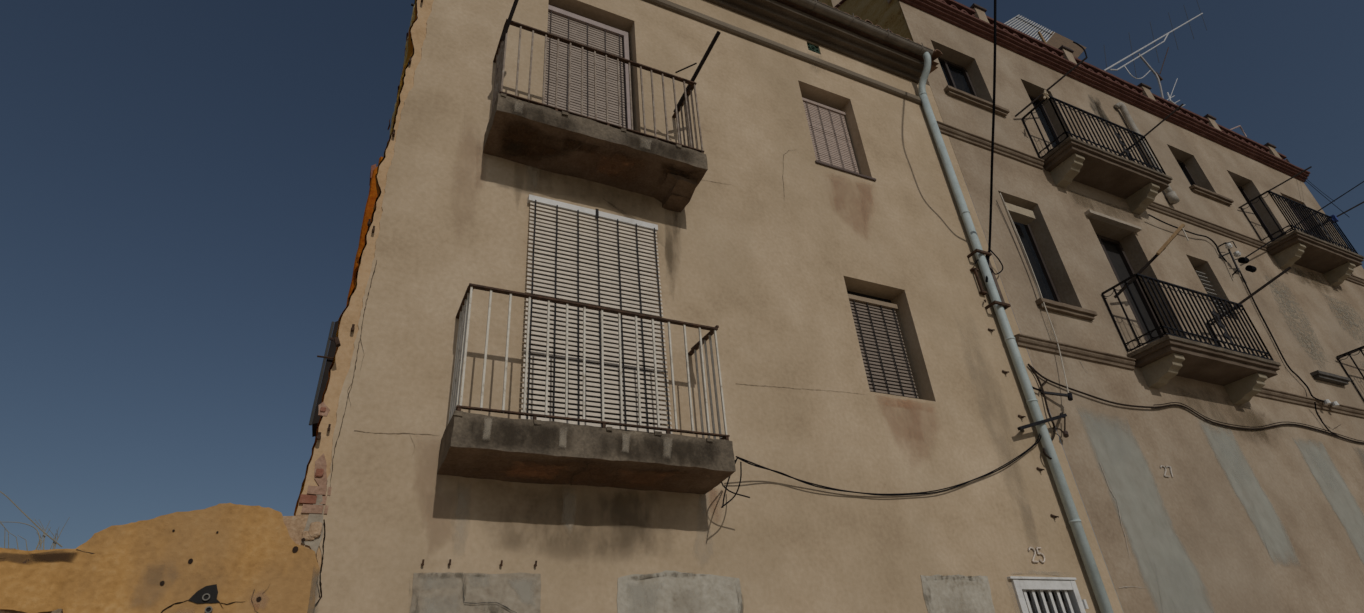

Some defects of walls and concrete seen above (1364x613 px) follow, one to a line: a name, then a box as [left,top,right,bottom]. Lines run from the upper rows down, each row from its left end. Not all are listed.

spalling [299,453,331,554]
crack [161,589,264,613]
crack [314,519,326,608]
crack [463,575,517,613]